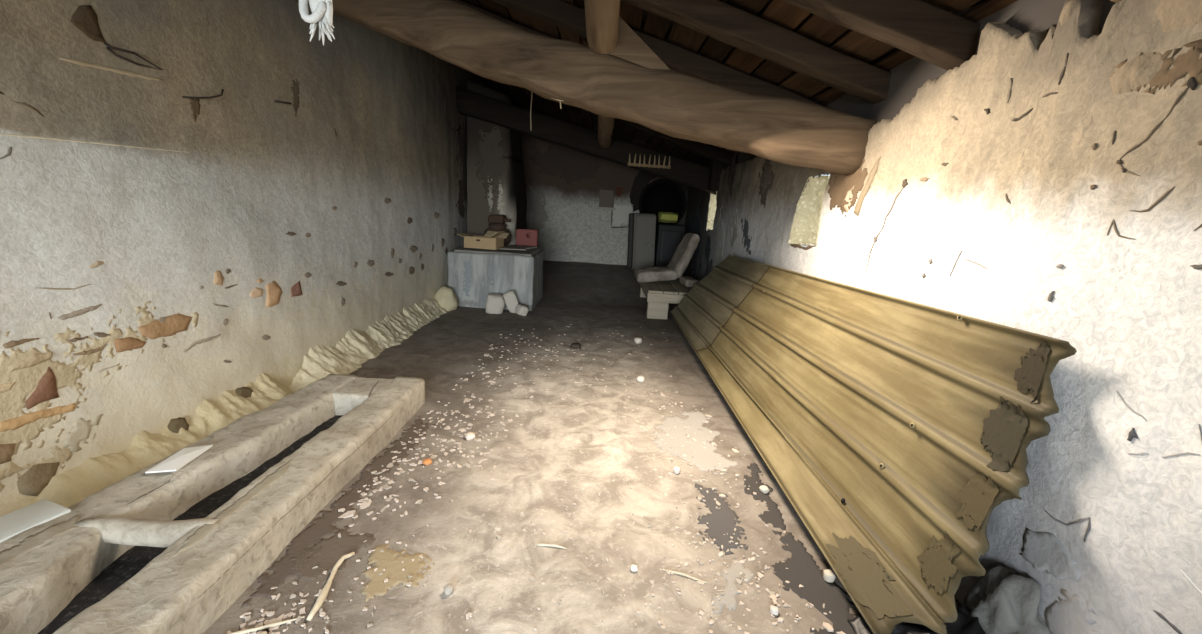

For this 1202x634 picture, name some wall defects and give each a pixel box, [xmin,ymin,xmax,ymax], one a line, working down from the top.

crack [1112,87,1189,176]
spalling [828,144,868,217]
crack [864,188,903,279]
crack [1107,186,1175,240]
flaking render [199,269,231,289]
flaking render [249,272,311,308]
spalling [0,301,228,496]
crack [1045,510,1091,542]